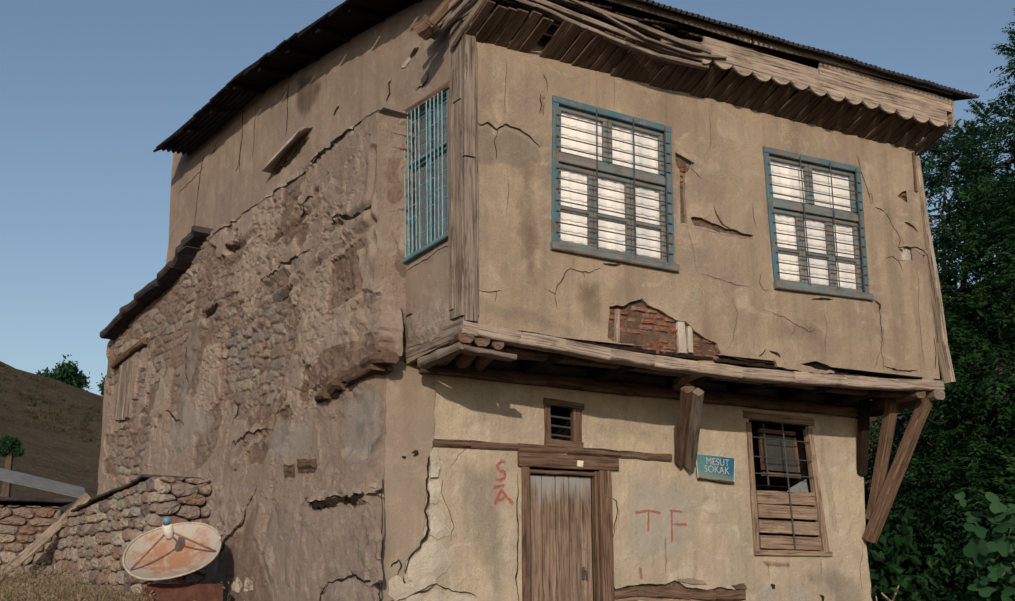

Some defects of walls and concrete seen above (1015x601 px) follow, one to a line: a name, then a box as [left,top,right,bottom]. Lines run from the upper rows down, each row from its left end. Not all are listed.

crack [416,72,429,91]
crack [178,78,391,241]
spalling [675,155,752,239]
crack [714,206,756,229]
spalling [608,300,719,360]
crack [688,231,832,364]
crack [857,155,936,372]
spalling [306,474,382,509]
peeling [388,447,478,601]
crack [319,570,438,601]